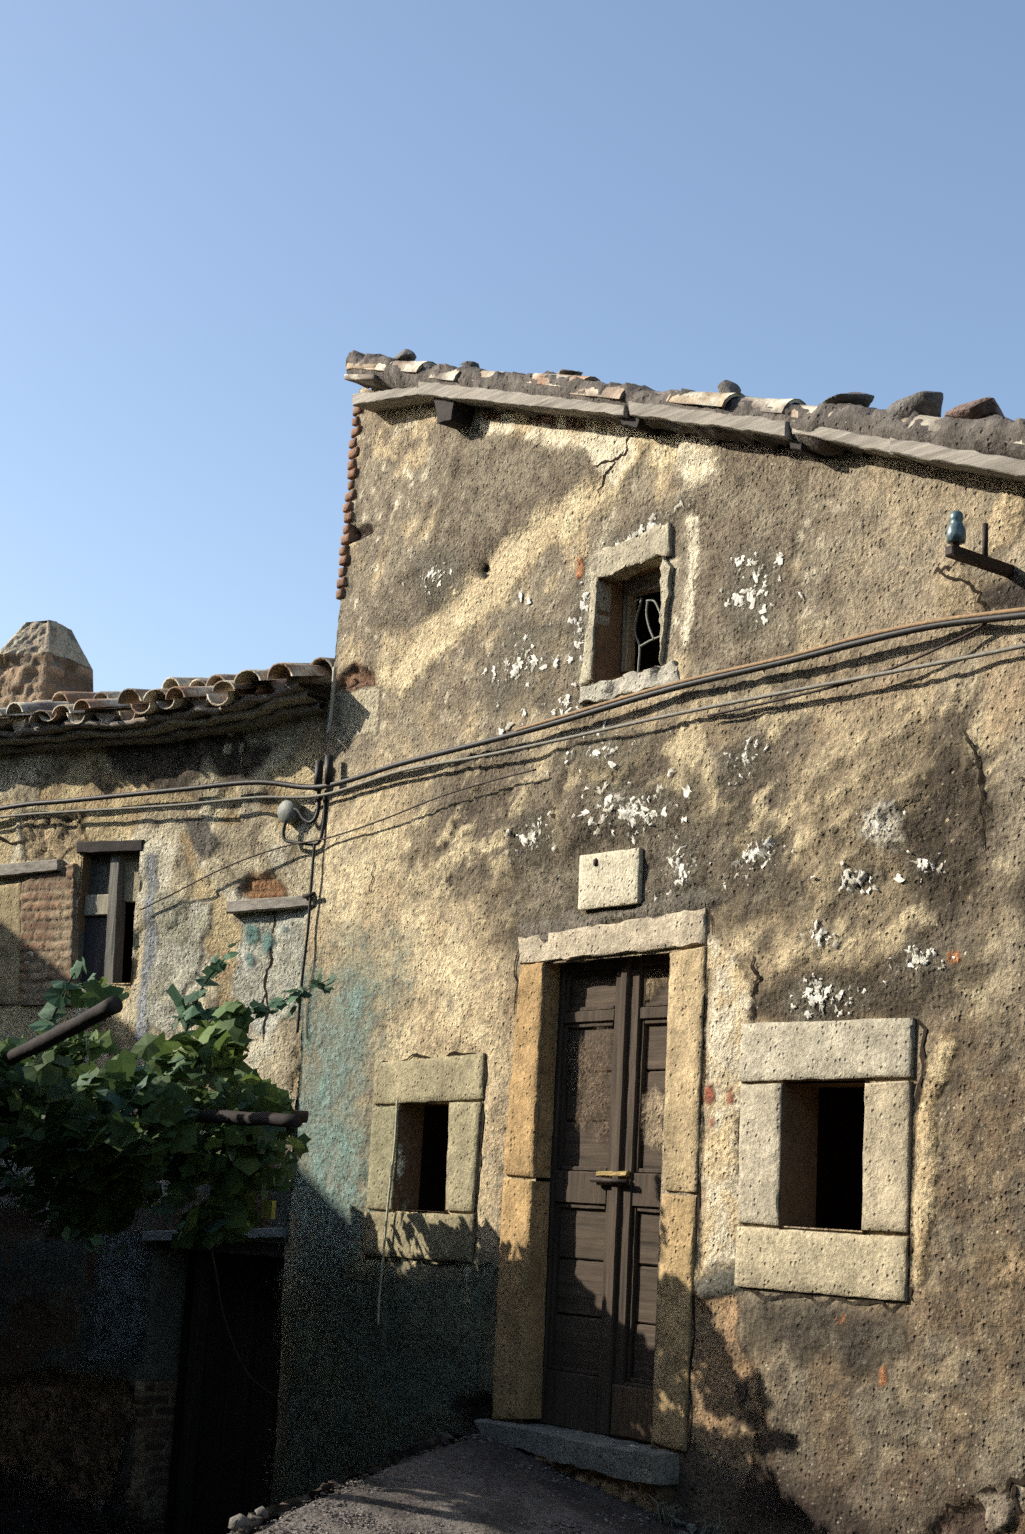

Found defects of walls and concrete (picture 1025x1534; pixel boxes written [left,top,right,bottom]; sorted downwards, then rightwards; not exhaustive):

crack [593,435,634,496]
peeling [461,407,719,735]
peeling [720,545,803,625]
crack [932,561,965,579]
peeling [565,721,794,901]
peeling [856,806,906,837]
peeling [894,850,948,883]
peeling [801,920,838,951]
peeling [883,945,967,984]
peeling [790,973,866,1020]
spalling [929,1493,1025,1534]